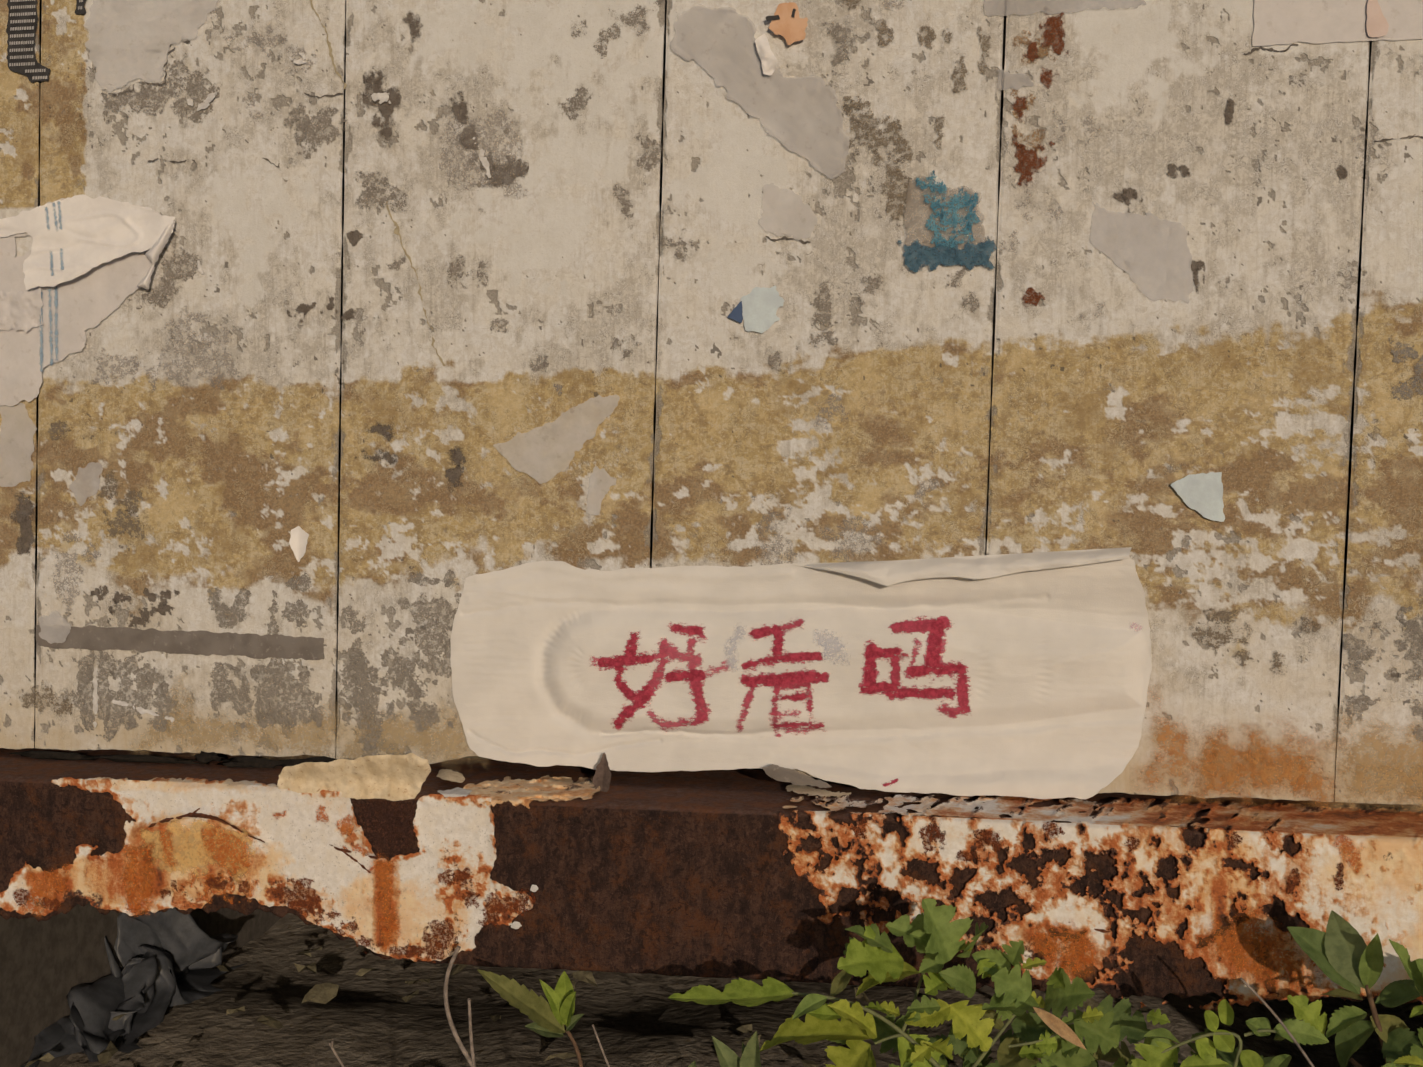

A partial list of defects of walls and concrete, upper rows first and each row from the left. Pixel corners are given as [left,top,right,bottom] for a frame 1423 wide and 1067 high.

rust [1010,12,1068,186]
peeling [809,282,838,347]
rust [1022,287,1045,306]
peeling [356,423,397,465]
peeling [445,447,466,488]
peeling [1192,608,1253,666]
peeling [1343,606,1423,742]
peeling [0,569,600,962]
rust [1144,722,1329,808]
rust [918,816,1001,862]
rust [1124,837,1140,864]
rust [1333,835,1368,891]